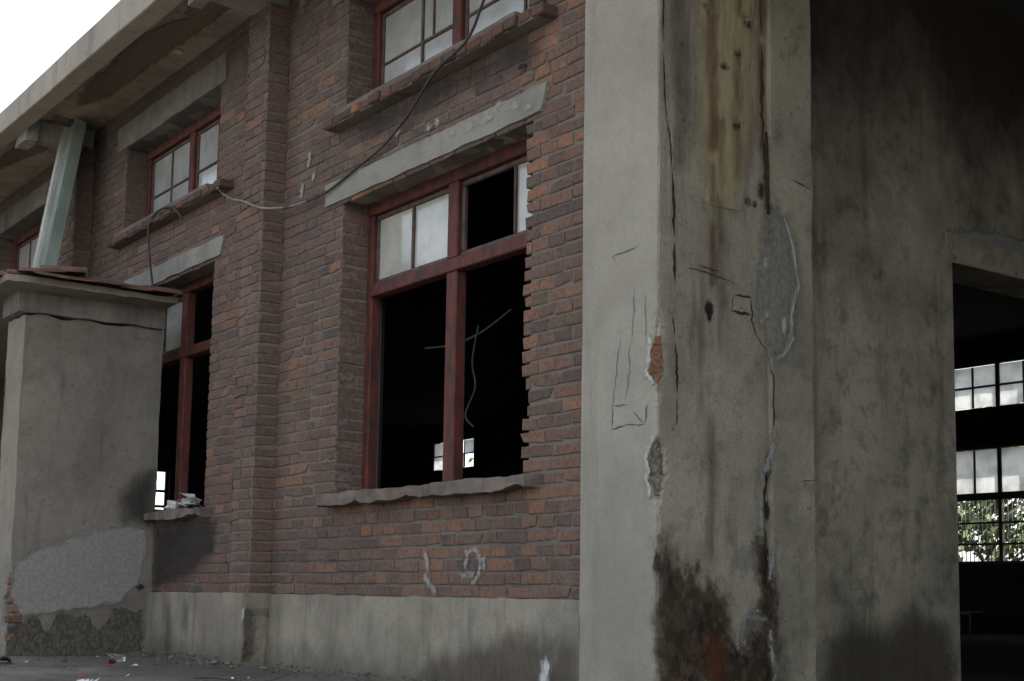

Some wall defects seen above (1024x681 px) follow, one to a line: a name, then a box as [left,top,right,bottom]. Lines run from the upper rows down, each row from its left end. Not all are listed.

crack [662,0,777,589]
spalling [644,334,663,386]
spalling [644,436,663,499]
flaking render [4,572,143,657]
leakage [652,537,781,681]